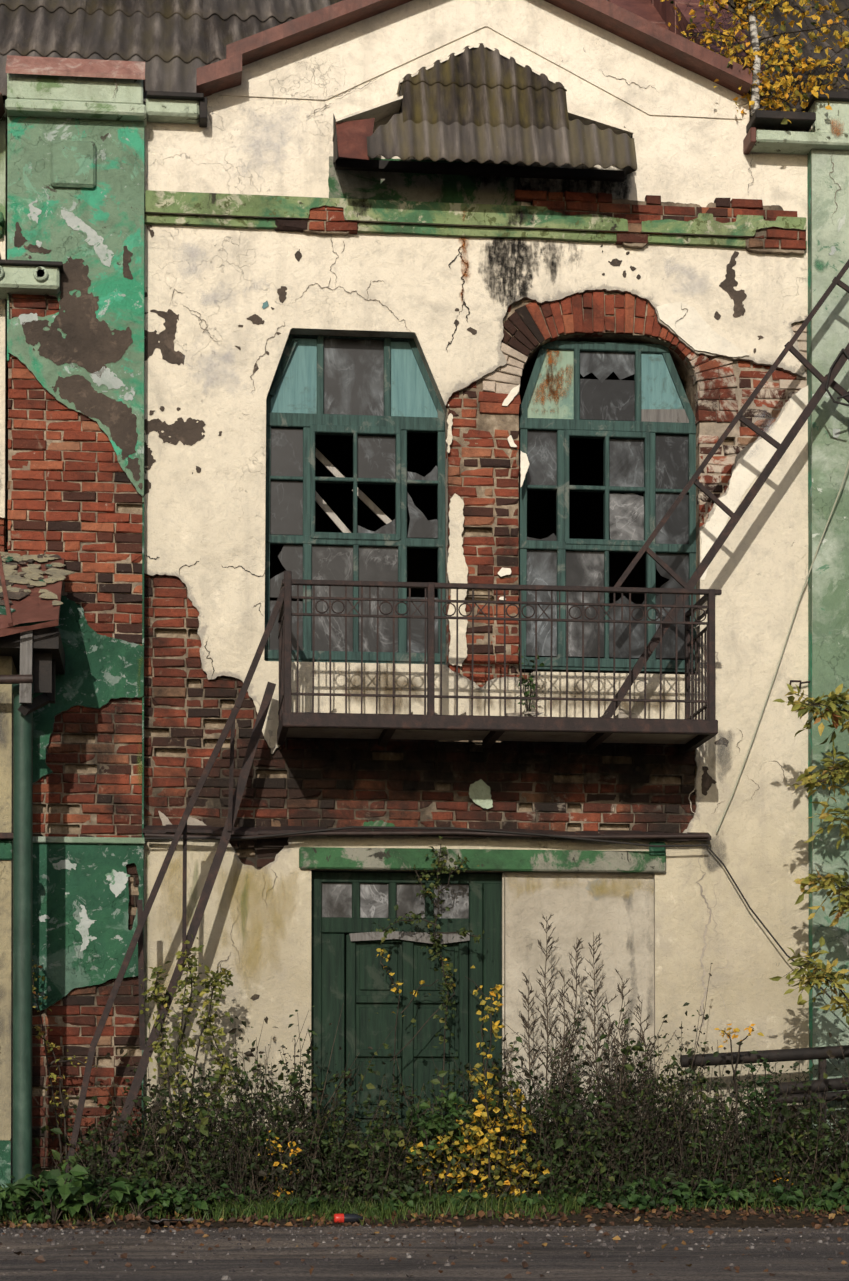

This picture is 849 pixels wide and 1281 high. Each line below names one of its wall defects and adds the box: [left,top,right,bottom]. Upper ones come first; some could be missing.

damp [352,200,372,214]
damp [470,165,633,303]
crack [170,290,222,342]
crack [244,236,470,415]
flaking render [445,190,808,687]
flaking render [0,200,717,870]
peeling [76,905,97,951]
peeling [105,869,130,897]